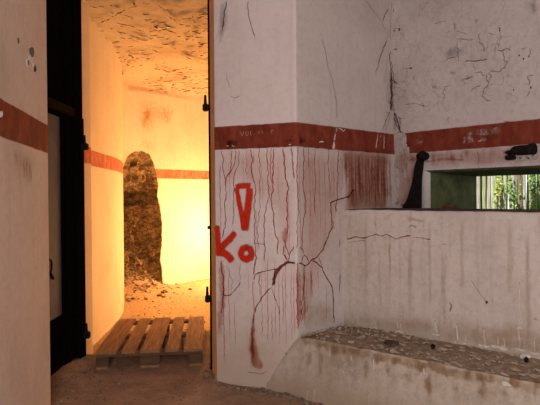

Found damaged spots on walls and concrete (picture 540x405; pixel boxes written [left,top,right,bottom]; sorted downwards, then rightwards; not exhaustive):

spalling [26,47,37,72]
crack [376,41,403,133]
rust [221,151,239,217]
rust [245,148,289,274]
rust [282,148,315,248]
crack [254,190,354,320]
peeling [394,132,411,199]
water stain [478,283,540,356]